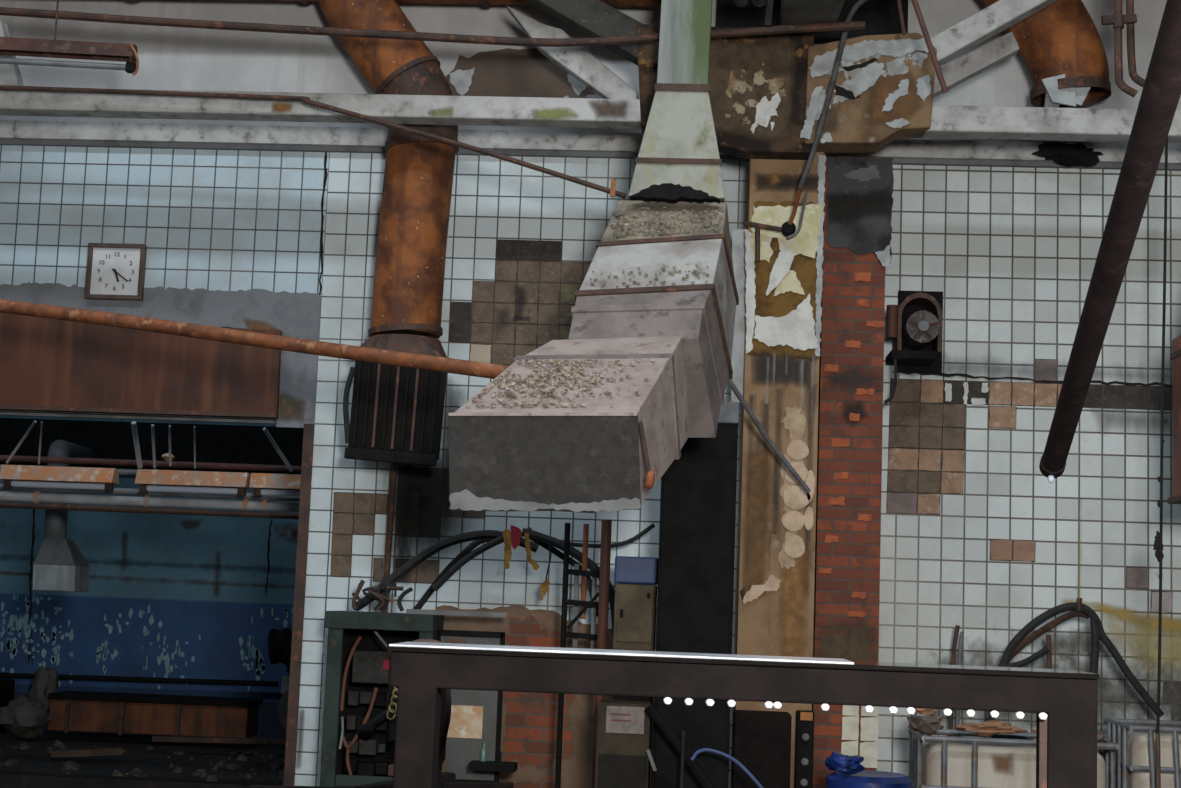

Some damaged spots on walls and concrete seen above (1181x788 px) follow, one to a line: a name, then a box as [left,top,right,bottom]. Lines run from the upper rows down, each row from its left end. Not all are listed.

peeling [745,38,931,372]
peeling [448,239,591,366]
peeling [779,406,806,513]
peeling [886,359,1062,515]
peeling [1083,384,1172,410]
peeling [0,594,74,673]
peeling [96,604,201,690]
peeling [239,606,294,691]
damp [389,642,854,664]
spalling [740,531,800,639]
spalling [847,591,866,617]
damp [1097,670,1181,726]